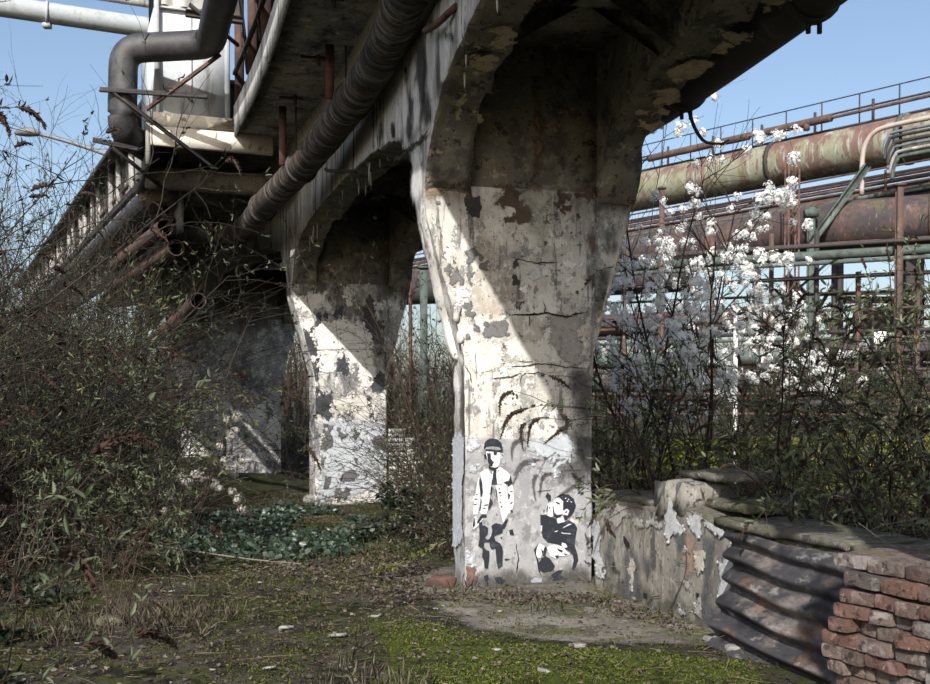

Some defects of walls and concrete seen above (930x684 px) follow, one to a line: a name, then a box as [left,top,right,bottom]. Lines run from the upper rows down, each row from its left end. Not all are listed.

spalling [635,28,753,134]
spalling [464,180,482,218]
peeling [294,291,327,315]
peeling [342,286,356,307]
peeling [373,300,391,316]
peeling [442,241,591,380]
crack [513,301,586,327]
peeling [310,318,387,503]
peeling [591,497,734,619]